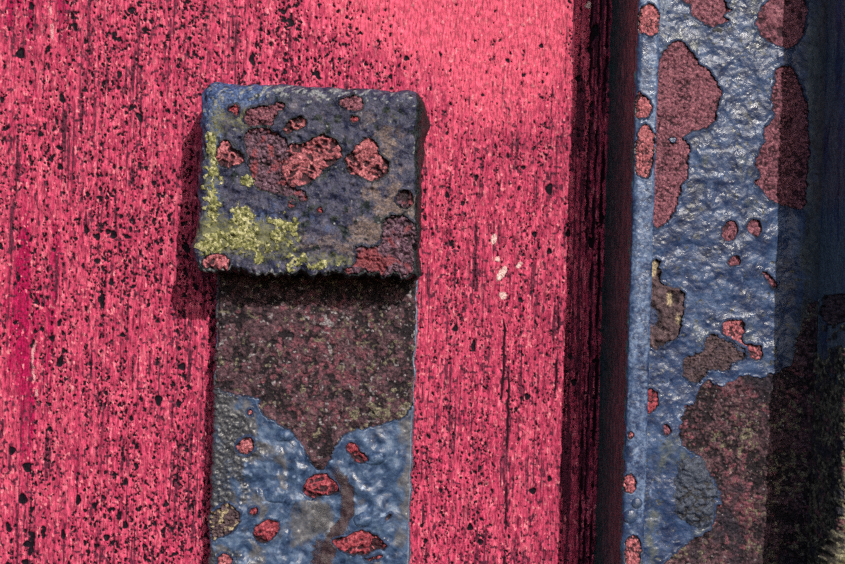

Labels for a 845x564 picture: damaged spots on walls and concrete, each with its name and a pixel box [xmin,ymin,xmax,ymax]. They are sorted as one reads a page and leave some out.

peeling [638,1,660,38]
peeling [680,0,734,29]
peeling [753,0,811,52]
peeling [635,39,723,231]
peeling [753,63,811,212]
peeling [216,100,392,216]
peeling [719,316,765,363]
peeling [648,377,660,415]
peeling [233,434,257,458]
peeling [343,440,368,464]
peeling [300,470,341,501]
peeling [331,528,390,563]